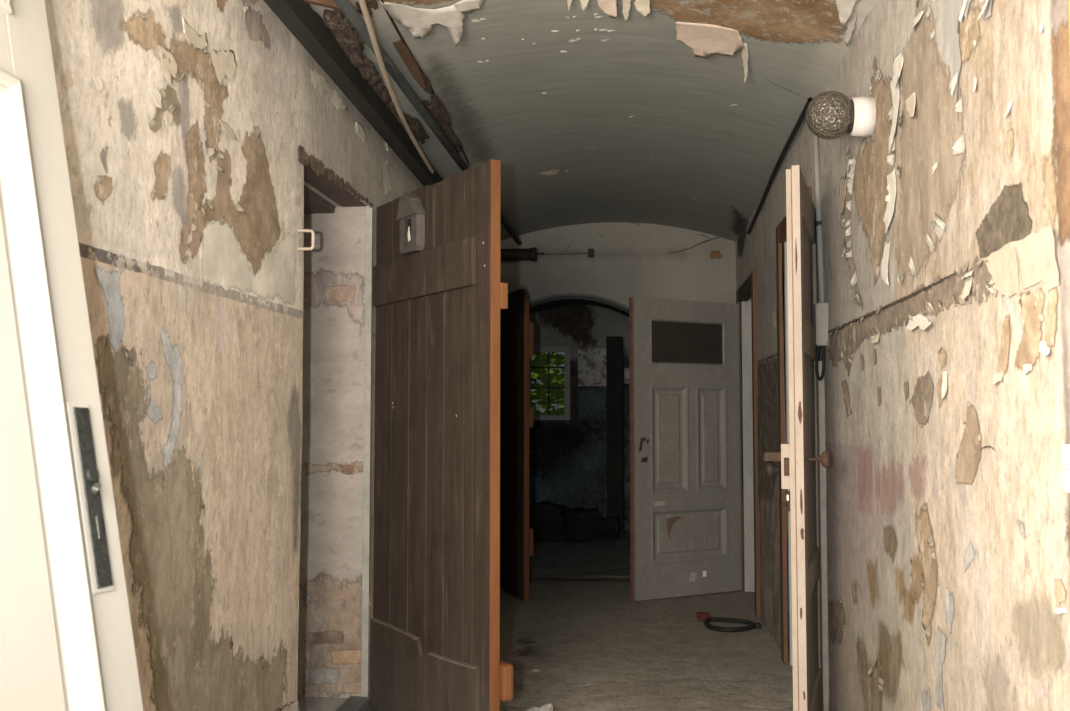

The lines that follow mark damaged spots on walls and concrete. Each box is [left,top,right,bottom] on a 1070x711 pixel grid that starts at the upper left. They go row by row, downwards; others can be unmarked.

peeling [94,146,113,205]
peeling [119,0,281,276]
flaking render [308,0,487,153]
peeling [559,0,859,84]
peeling [827,0,1059,428]
damp [288,393,299,548]
flaking render [955,402,995,485]
peeling [828,599,846,646]
peeling [915,503,955,711]
flaking render [1054,579,1066,614]